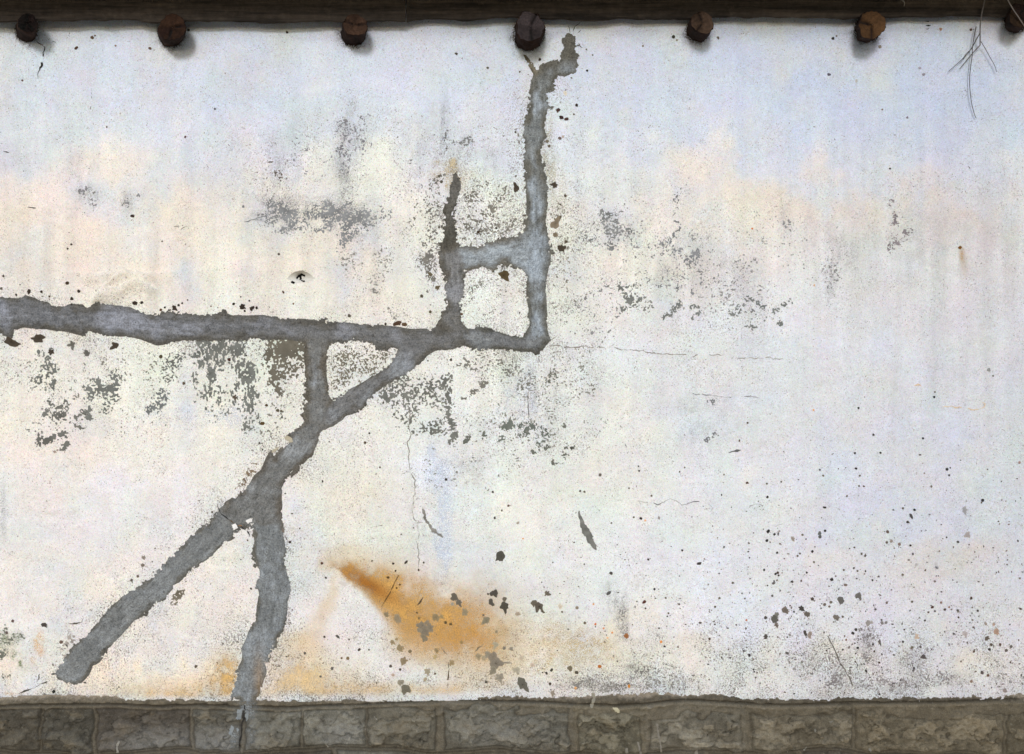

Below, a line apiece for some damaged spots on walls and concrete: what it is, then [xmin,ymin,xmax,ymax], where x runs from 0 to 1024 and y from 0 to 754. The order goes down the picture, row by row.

peeling [257,103,473,320]
peeling [4,334,305,489]
crack [403,411,421,567]
peeling [377,181,847,494]
rust [339,563,492,655]